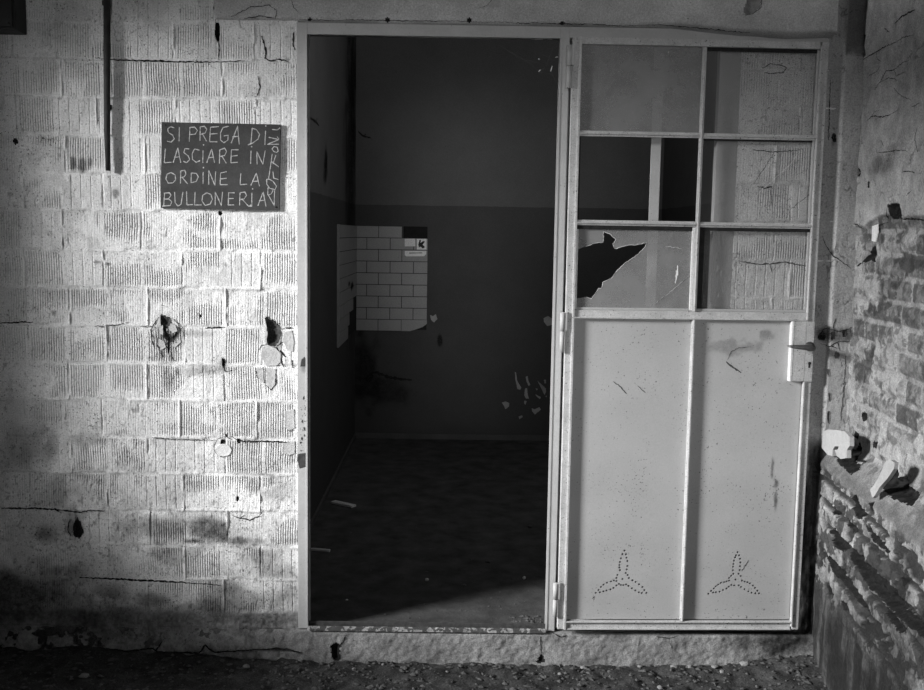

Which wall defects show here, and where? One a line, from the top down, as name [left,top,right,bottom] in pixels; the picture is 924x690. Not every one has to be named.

crack [863,10,918,120]
hole [888,203,903,220]
spalling [857,224,879,266]
hole [141,314,183,361]
spalling [256,317,294,390]
spalling [818,319,852,424]
spalling [837,431,866,475]
crack [1,506,104,514]
spalling [883,470,921,506]
crack [79,577,222,586]
spalling [827,495,924,638]
hole [330,637,345,661]